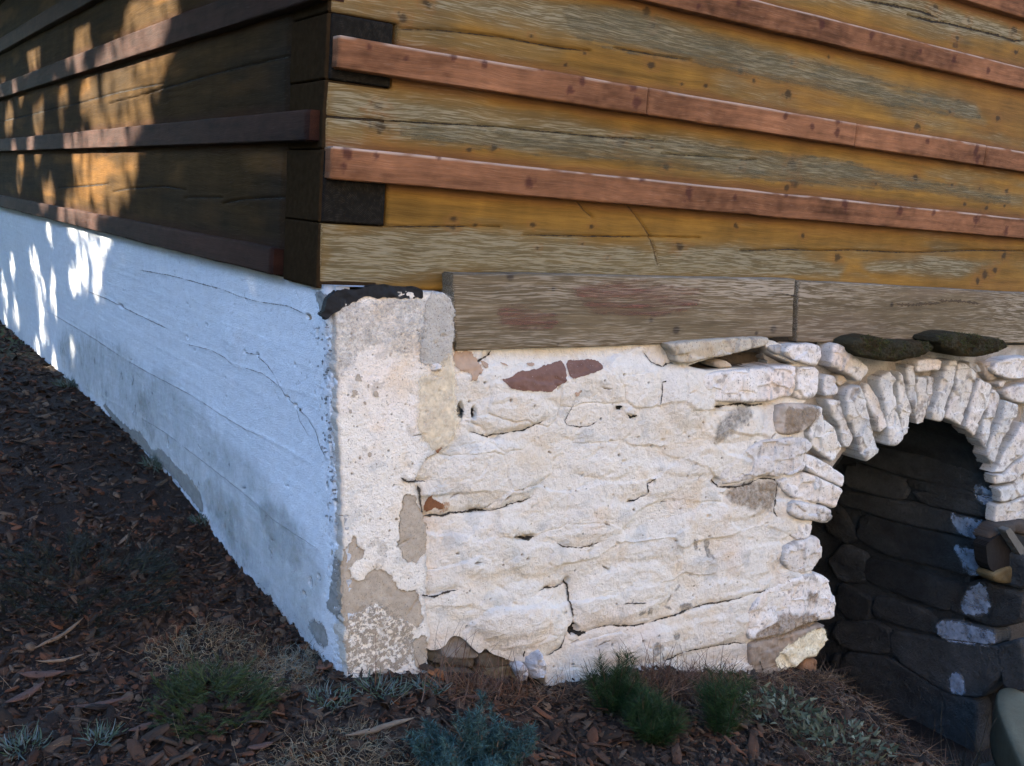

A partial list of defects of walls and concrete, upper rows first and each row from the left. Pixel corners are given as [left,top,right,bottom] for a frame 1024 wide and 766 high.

crack [191,345,324,454]
peeling [307,291,603,414]
spalling [321,396,338,522]
peeling [398,494,428,563]
crack [401,478,528,517]
peeling [326,537,525,683]
crack [422,590,456,598]
crack [523,579,765,657]